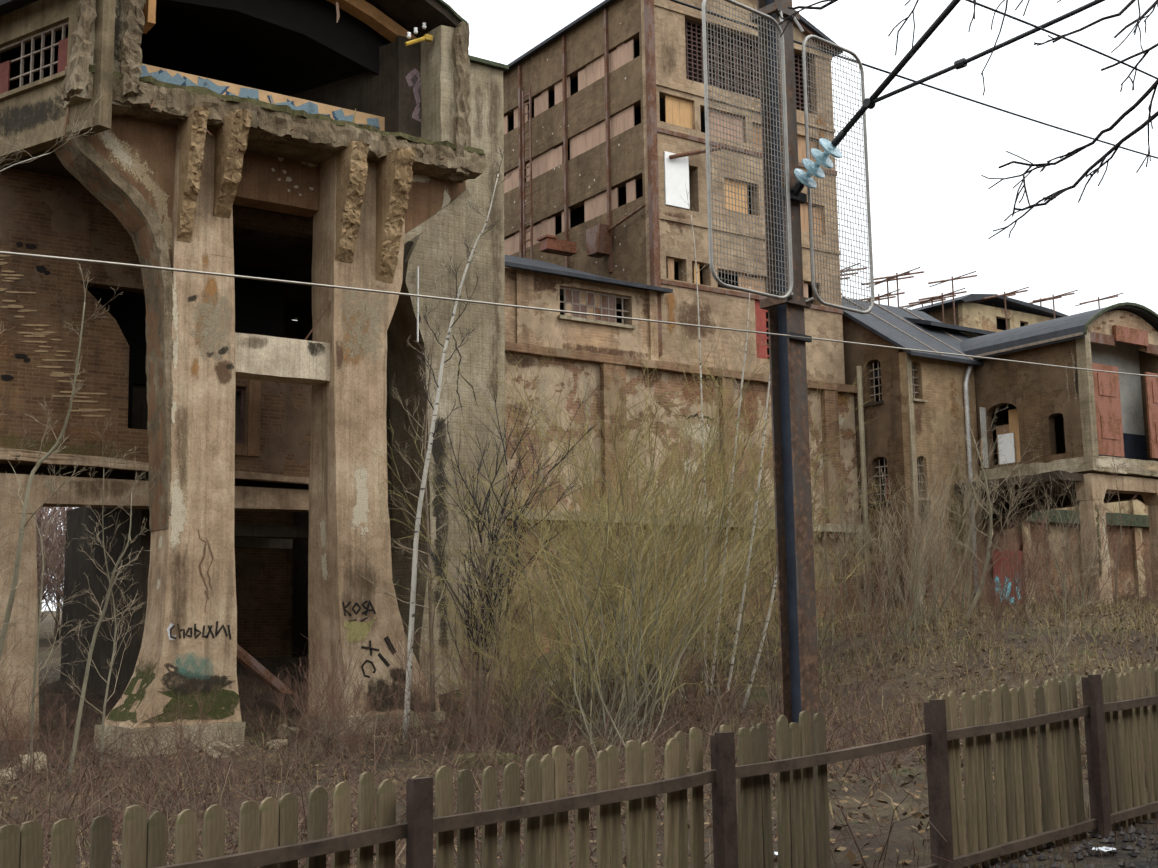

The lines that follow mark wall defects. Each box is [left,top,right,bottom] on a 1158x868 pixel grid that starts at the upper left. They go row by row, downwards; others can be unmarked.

spalling [0,242,111,417]
spalling [172,271,232,384]
peeling [158,401,188,555]